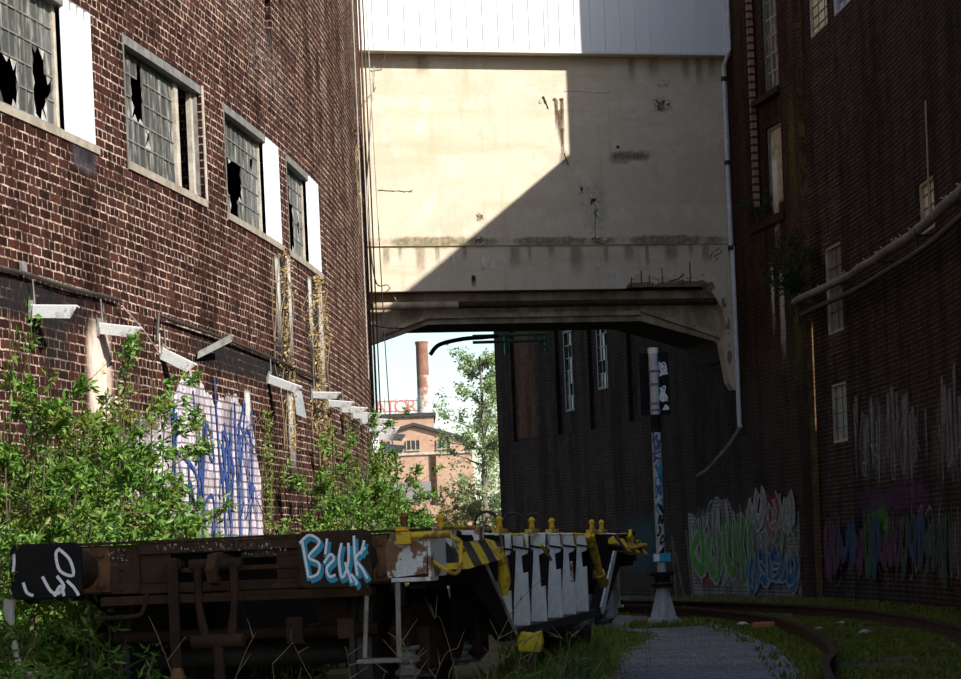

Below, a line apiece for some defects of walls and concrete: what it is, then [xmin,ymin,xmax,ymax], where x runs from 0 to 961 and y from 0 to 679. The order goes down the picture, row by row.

corrosion [553,98,564,146]
crack [564,153,607,244]
water stain [396,237,488,265]
spalling [626,262,715,291]